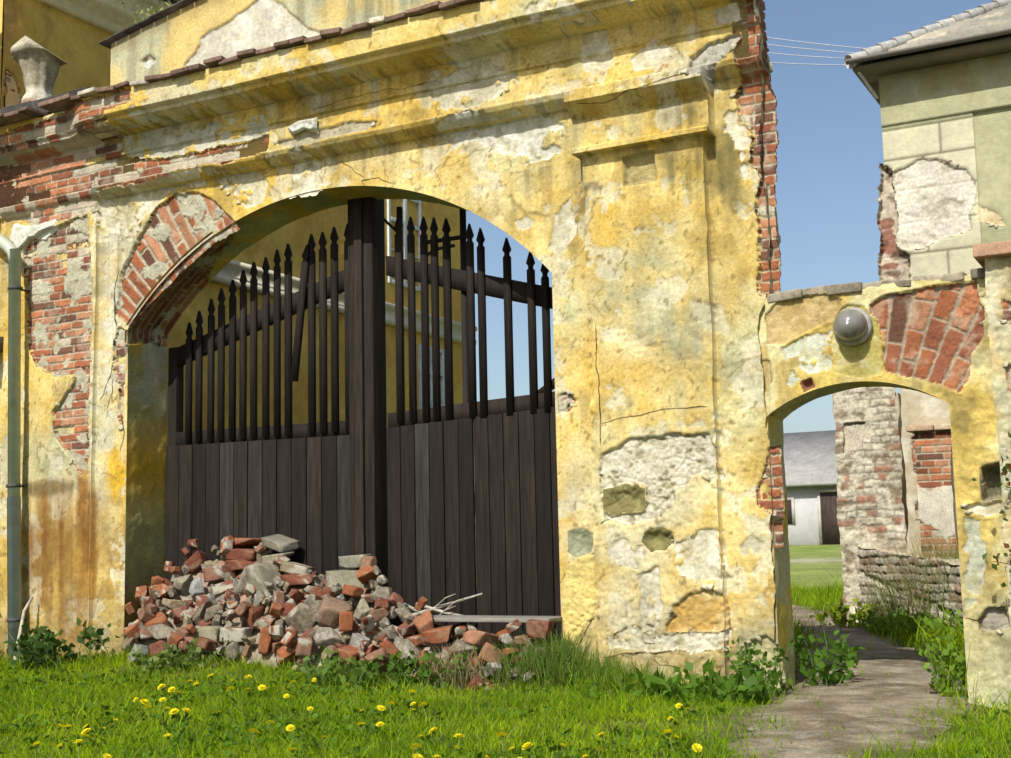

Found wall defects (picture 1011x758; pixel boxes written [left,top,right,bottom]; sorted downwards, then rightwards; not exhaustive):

flaking render [184,0,320,67]
flaking render [630,0,781,296]
flaking render [0,88,378,476]
flaking render [869,158,1011,395]
crack [595,324,707,445]
leakage [27,481,73,494]
flaking render [599,433,725,527]
flaking render [741,444,785,557]
flaking render [606,528,733,655]
flaking render [737,635,787,691]